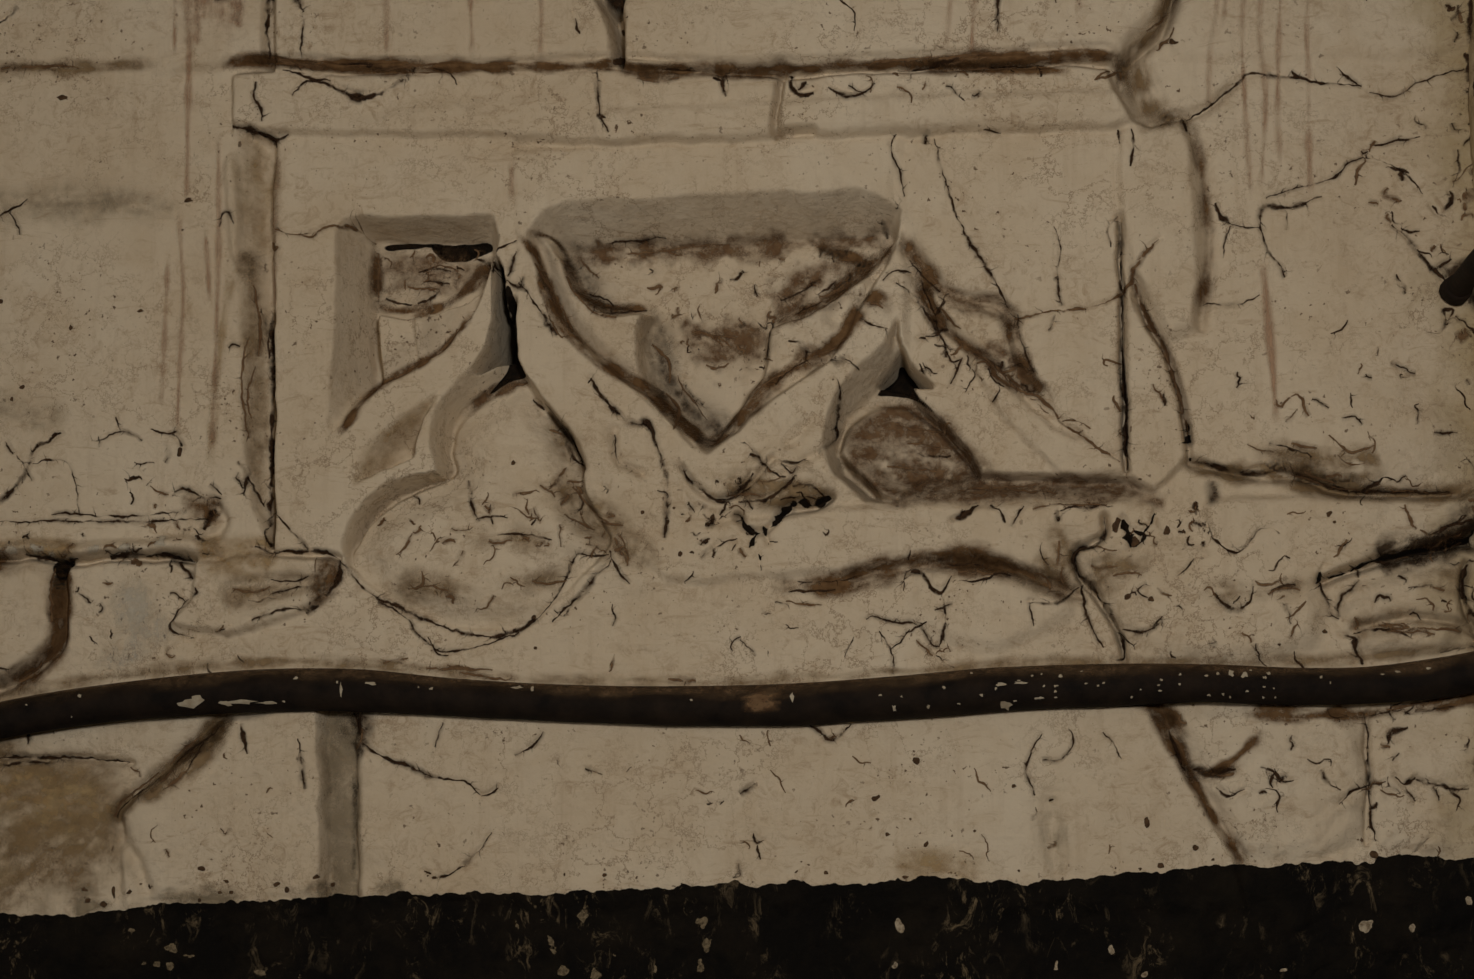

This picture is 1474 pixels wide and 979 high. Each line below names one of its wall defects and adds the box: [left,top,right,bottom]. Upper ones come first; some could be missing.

crack [232,0,457,148]
crack [596,73,609,132]
crack [1186,0,1474,342]
crack [272,215,558,335]
crack [0,251,860,673]
crack [1,734,140,776]
crack [223,726,248,759]
crack [362,723,498,796]
crack [696,730,786,805]
crack [810,724,871,765]
crack [1025,730,1122,811]
crack [1193,702,1467,841]